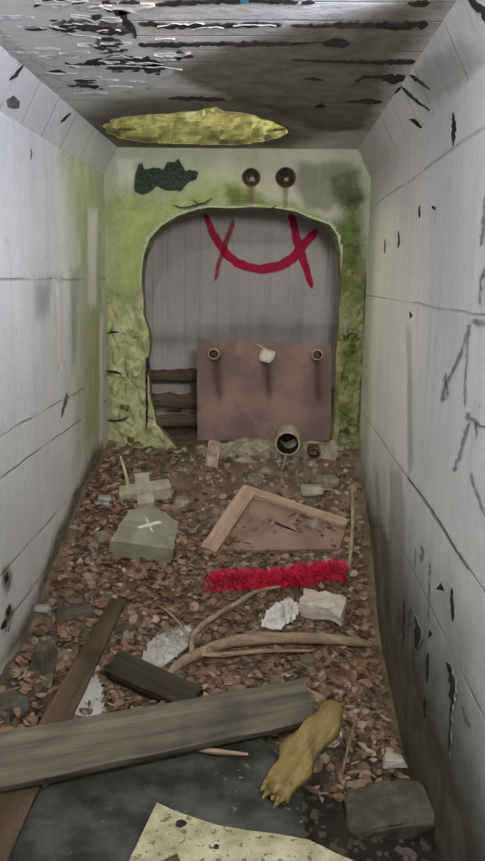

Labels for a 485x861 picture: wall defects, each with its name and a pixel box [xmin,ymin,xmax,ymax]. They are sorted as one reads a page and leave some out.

peeling [0,0,194,95]
spalling [322,38,350,49]
spalling [355,73,405,84]
spalling [102,107,288,145]
water stain [299,165,348,208]